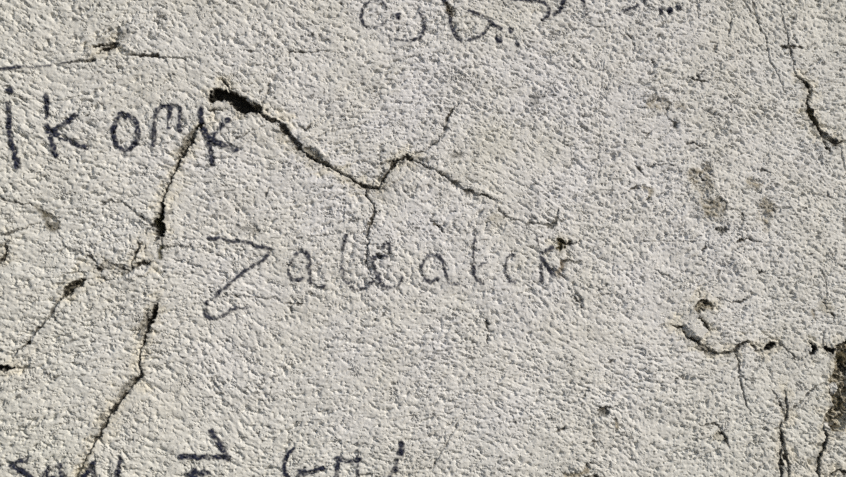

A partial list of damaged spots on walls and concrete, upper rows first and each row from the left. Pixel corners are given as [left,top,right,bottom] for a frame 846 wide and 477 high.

crack [752,5,842,152]
crack [103,81,488,257]
crack [510,216,564,229]
crack [23,278,86,347]
crack [75,304,158,477]
crack [674,325,795,405]
crack [767,398,796,477]
crack [816,428,846,477]